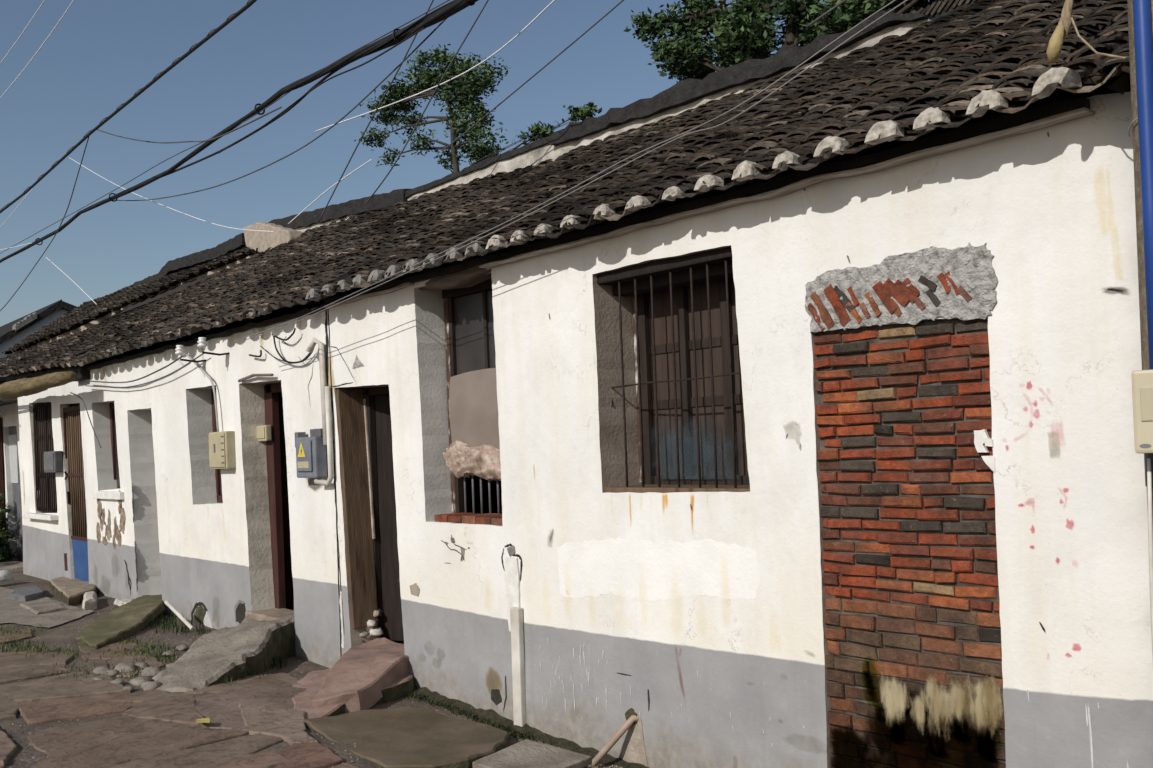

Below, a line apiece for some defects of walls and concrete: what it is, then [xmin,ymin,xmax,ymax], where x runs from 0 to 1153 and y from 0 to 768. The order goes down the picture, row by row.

peeling [96,487,138,596]
leakage [830,672,998,768]